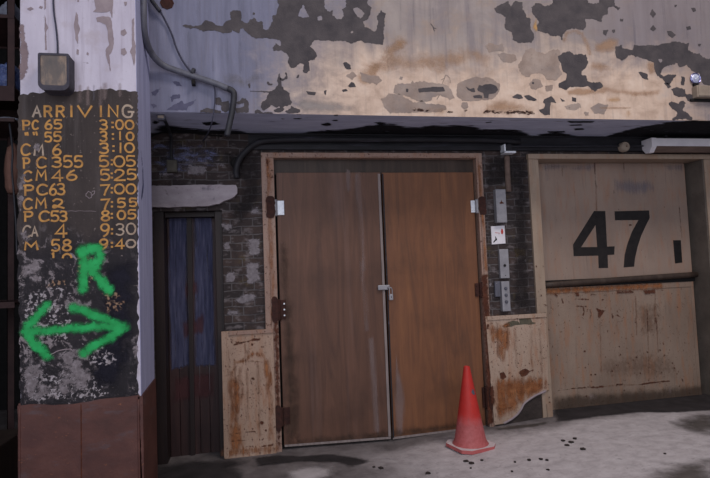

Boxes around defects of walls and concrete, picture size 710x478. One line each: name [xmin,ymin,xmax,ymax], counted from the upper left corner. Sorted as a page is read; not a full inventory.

spalling [160,0,174,9]
peeling [183,0,386,114]
peeling [381,76,500,113]
peeling [486,0,620,116]
peeling [615,31,710,120]
rust [229,380,280,455]
rust [231,322,280,410]
rust [482,244,549,424]
spalling [503,390,546,424]
rust [541,283,662,306]